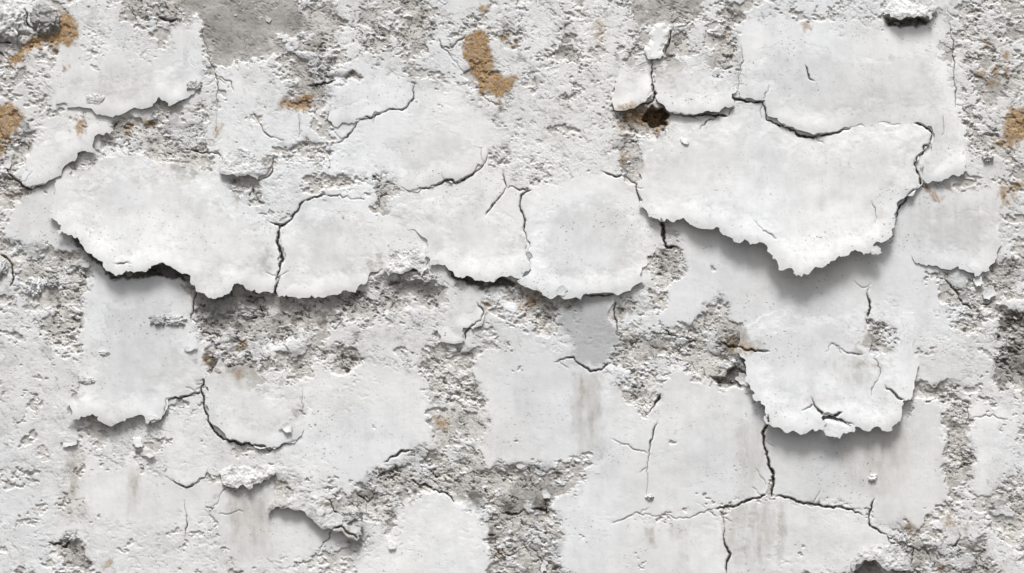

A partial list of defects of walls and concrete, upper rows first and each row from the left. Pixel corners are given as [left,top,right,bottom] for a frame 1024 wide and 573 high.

corrosion [0,103,23,156]
corrosion [9,10,78,64]
crack [252,82,415,319]
crack [408,158,531,253]
peeling [0,0,967,449]
corrosion [462,30,518,101]
peeling [912,206,1024,387]
crack [164,380,288,451]
flaking render [132,303,564,573]
crack [616,395,960,573]
peeling [609,294,977,523]